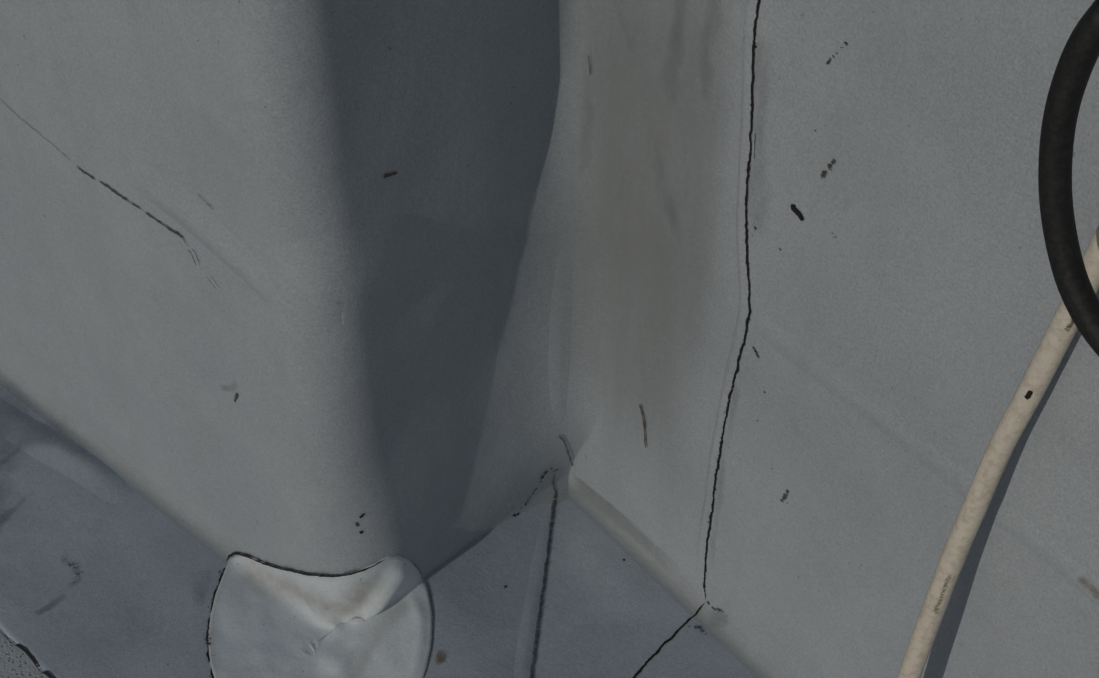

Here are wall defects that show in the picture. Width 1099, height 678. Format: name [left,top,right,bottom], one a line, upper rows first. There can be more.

crack [5,104,215,287]
crack [633,0,760,678]
crack [514,478,557,678]